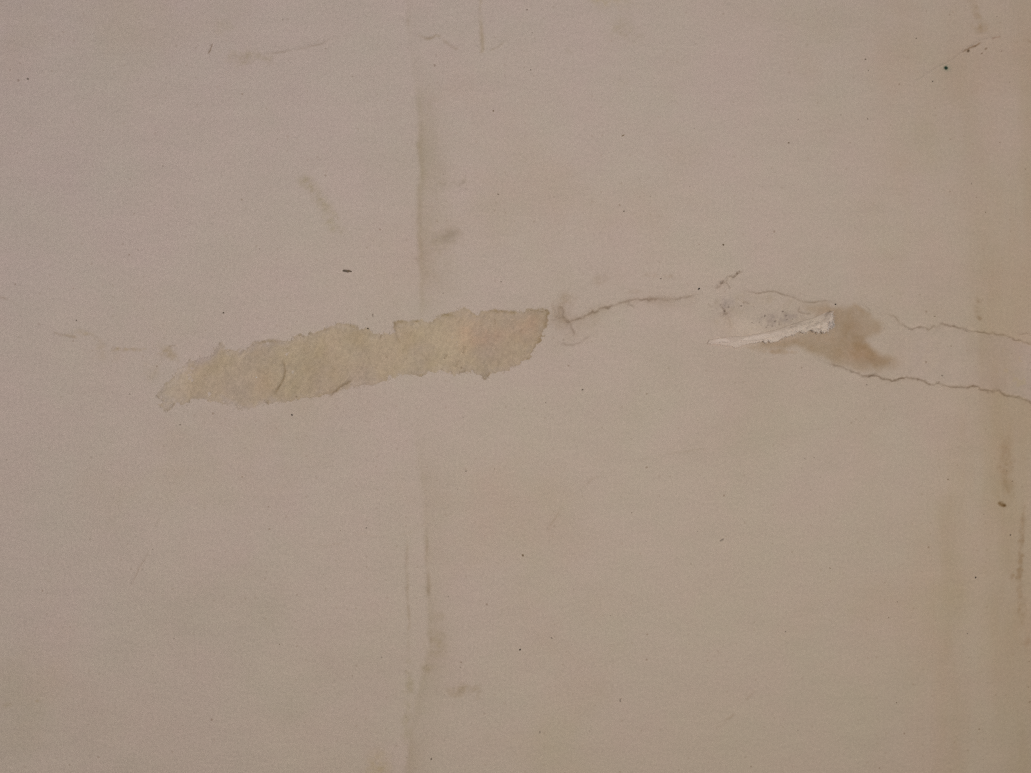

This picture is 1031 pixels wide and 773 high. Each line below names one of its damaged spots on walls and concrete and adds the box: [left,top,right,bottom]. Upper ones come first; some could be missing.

peeling [155,305,551,413]
leakage [742,298,905,367]